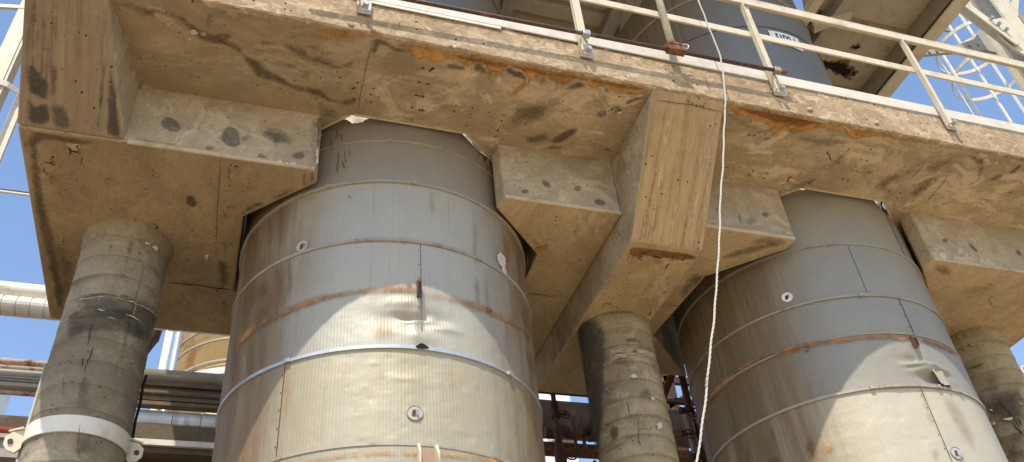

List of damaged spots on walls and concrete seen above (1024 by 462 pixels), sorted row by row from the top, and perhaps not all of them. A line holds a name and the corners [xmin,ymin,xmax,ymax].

water stain [181,18,295,88]
corrosion [404,45,647,96]
water stain [97,87,119,135]
water stain [162,118,179,131]
water stain [223,127,240,146]
corrosion [726,105,929,144]
water stain [29,66,86,307]
corrosion [628,239,695,262]
corrosion [239,286,415,342]
corrosion [708,335,908,404]